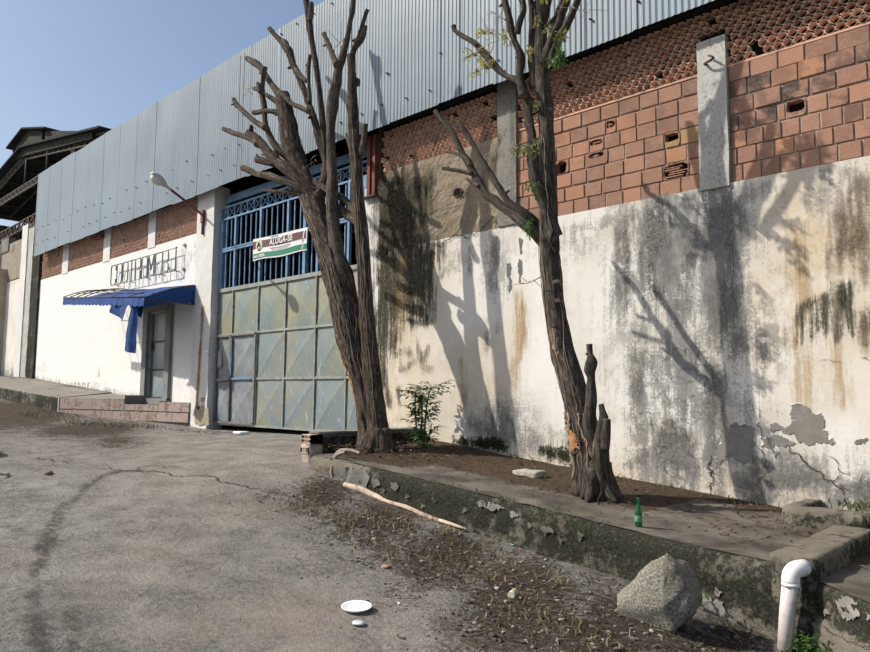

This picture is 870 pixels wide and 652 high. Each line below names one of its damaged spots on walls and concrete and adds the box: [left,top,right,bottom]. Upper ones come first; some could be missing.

damp [826,176,870,282]
crack [107,465,259,489]
corrosion [194,306,204,420]
damp [372,168,445,407]
crack [638,332,868,498]
peeling [711,402,835,464]
damp [796,281,868,345]
peeling [823,596,870,621]